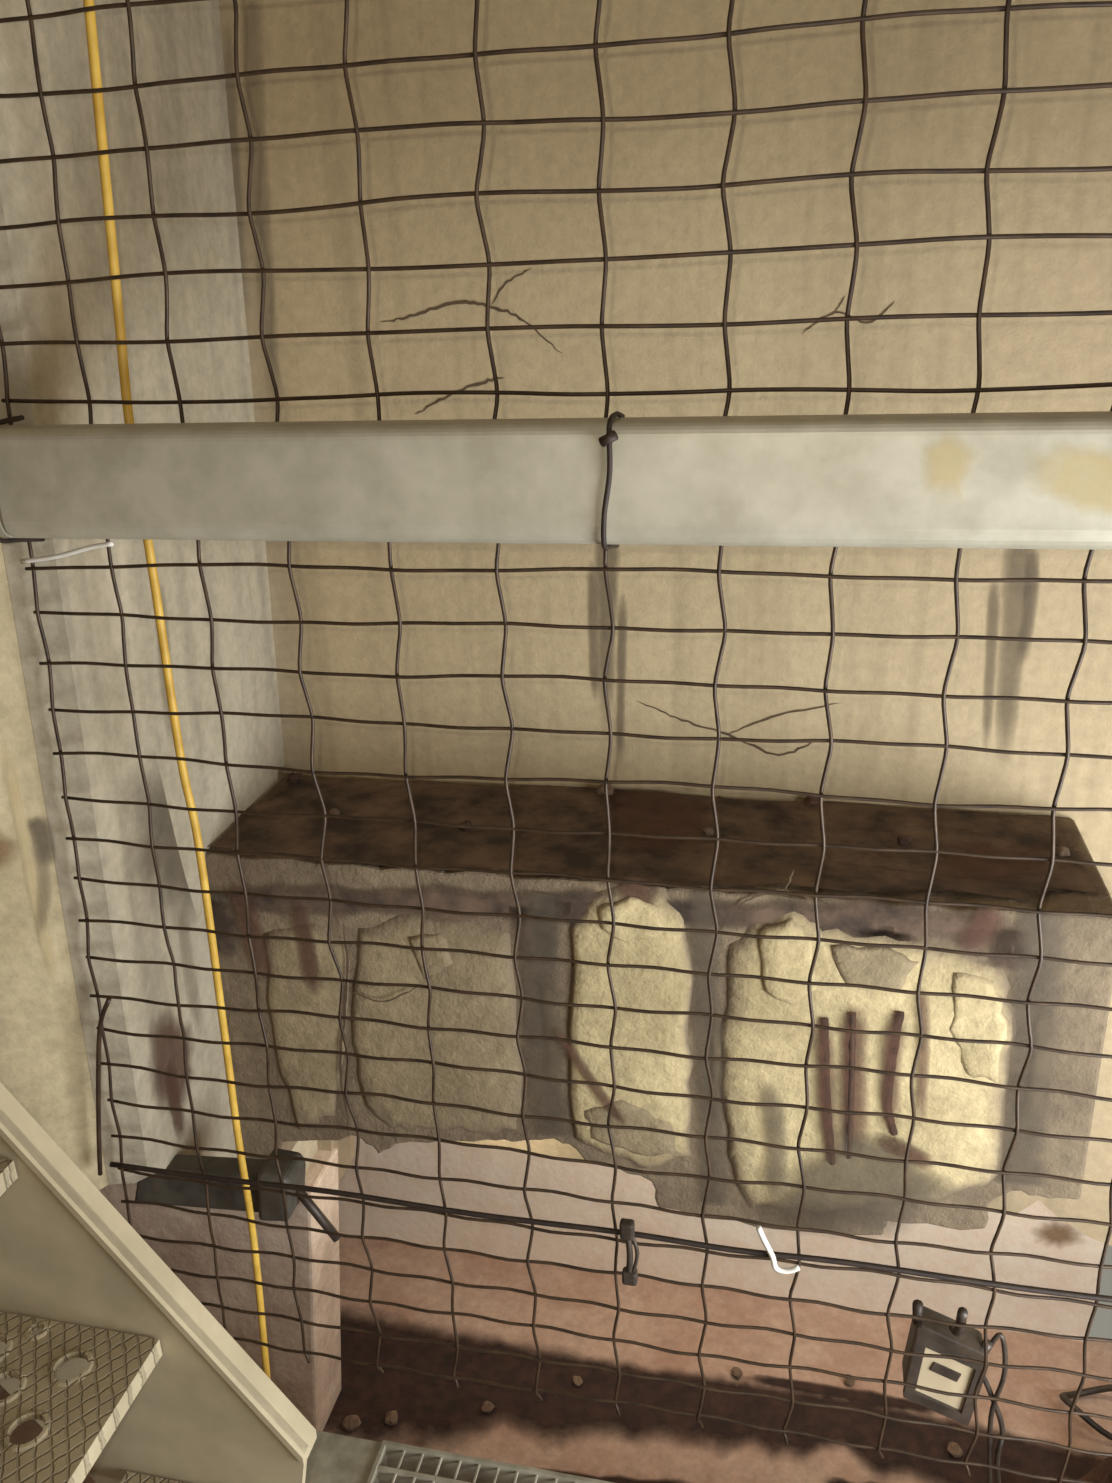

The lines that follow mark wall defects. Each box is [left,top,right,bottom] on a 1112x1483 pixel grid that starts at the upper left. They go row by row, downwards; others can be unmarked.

crack [382,268,561,353]
crack [416,377,503,414]
damp [590,546,626,743]
damp [987,549,1037,730]
crack [637,701,838,756]
corrosion [818,1015,929,1166]
corrosion [919,995,929,1109]